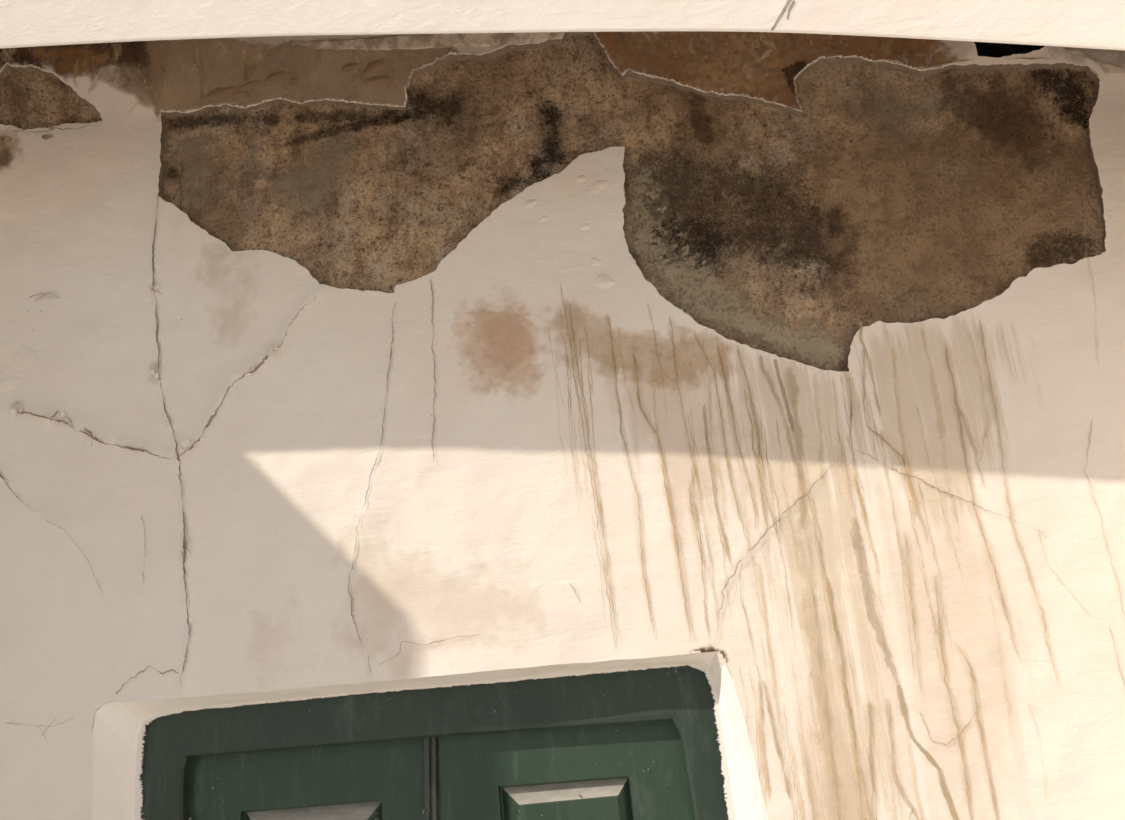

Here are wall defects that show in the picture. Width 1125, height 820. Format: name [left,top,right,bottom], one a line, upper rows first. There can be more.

crack [771,0,795,31]
flaking render [0,69,103,142]
flaking render [163,32,1125,372]
crack [9,196,280,694]
crack [348,304,396,668]
leakage [664,484,678,556]
leakage [691,469,728,635]
leakage [714,372,793,633]
leakage [853,460,877,570]
leakage [813,499,873,775]
leakage [753,682,777,792]
leakage [888,685,972,820]